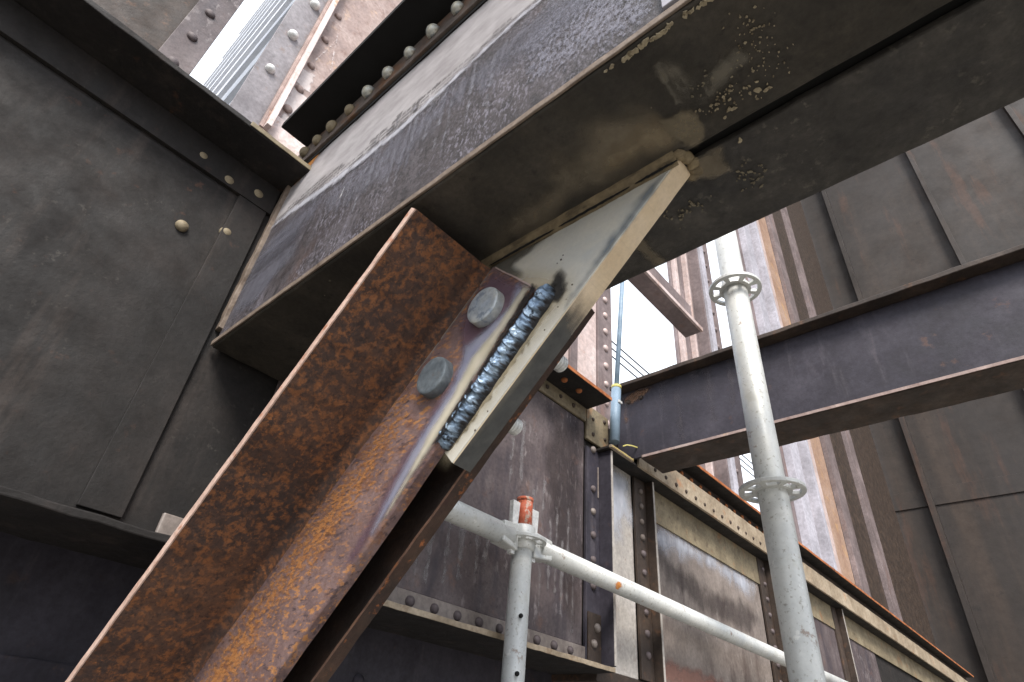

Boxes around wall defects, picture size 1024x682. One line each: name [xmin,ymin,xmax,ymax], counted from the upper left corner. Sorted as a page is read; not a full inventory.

peeling [689,5,794,119]
corrosion [200,389,412,682]